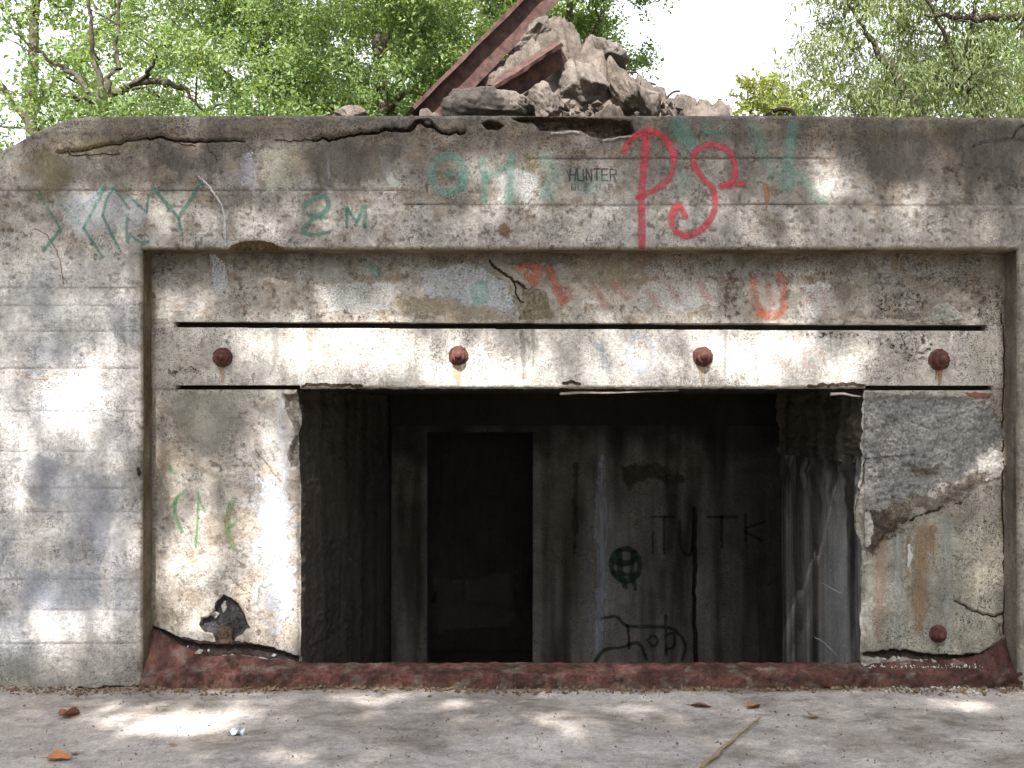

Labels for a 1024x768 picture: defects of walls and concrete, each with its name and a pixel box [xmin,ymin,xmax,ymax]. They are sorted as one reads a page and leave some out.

crack [63,136,243,162]
crack [488,259,527,303]
spalling [807,382,1005,559]
crack [863,313,1005,662]
spalling [199,595,250,644]